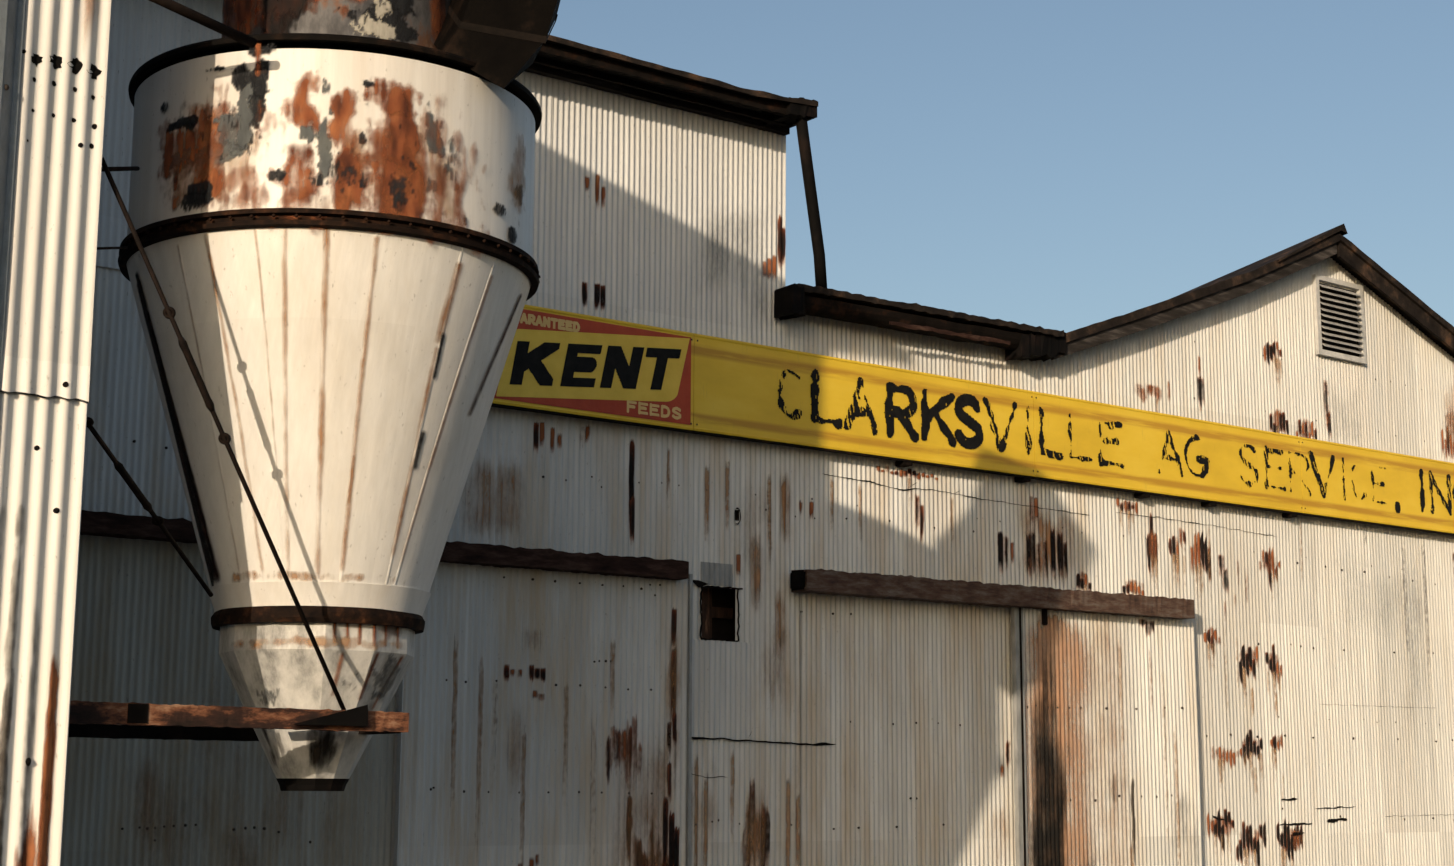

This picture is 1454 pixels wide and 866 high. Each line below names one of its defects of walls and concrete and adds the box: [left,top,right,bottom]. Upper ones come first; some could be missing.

corrosion [158,102,256,210]
corrosion [281,73,475,222]
corrosion [1263,341,1282,369]
corrosion [1441,415,1454,458]
corrosion [998,497,1092,590]
corrosion [1204,627,1282,711]
corrosion [16,658,59,866]
corrosion [606,609,708,866]
corrosion [730,754,800,866]
corrosion [1027,615,1092,866]
corrosion [1216,730,1283,769]
corrosion [1207,809,1303,866]